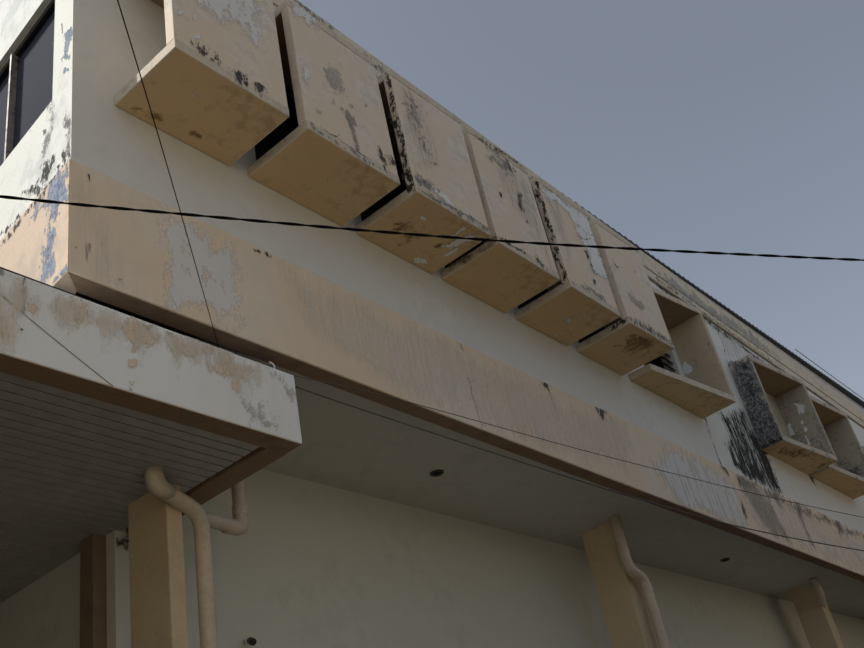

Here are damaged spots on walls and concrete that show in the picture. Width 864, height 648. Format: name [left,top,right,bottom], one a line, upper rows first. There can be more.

peeling [178,0,265,47]
mould [0,100,71,246]
peeling [29,165,69,283]
peeling [157,203,246,333]
leakage [311,52,484,229]
leakage [478,137,528,223]
leakage [528,175,606,303]
peeling [541,187,610,284]
peeling [56,297,261,393]
leakage [656,273,862,551]
peeling [653,446,749,531]